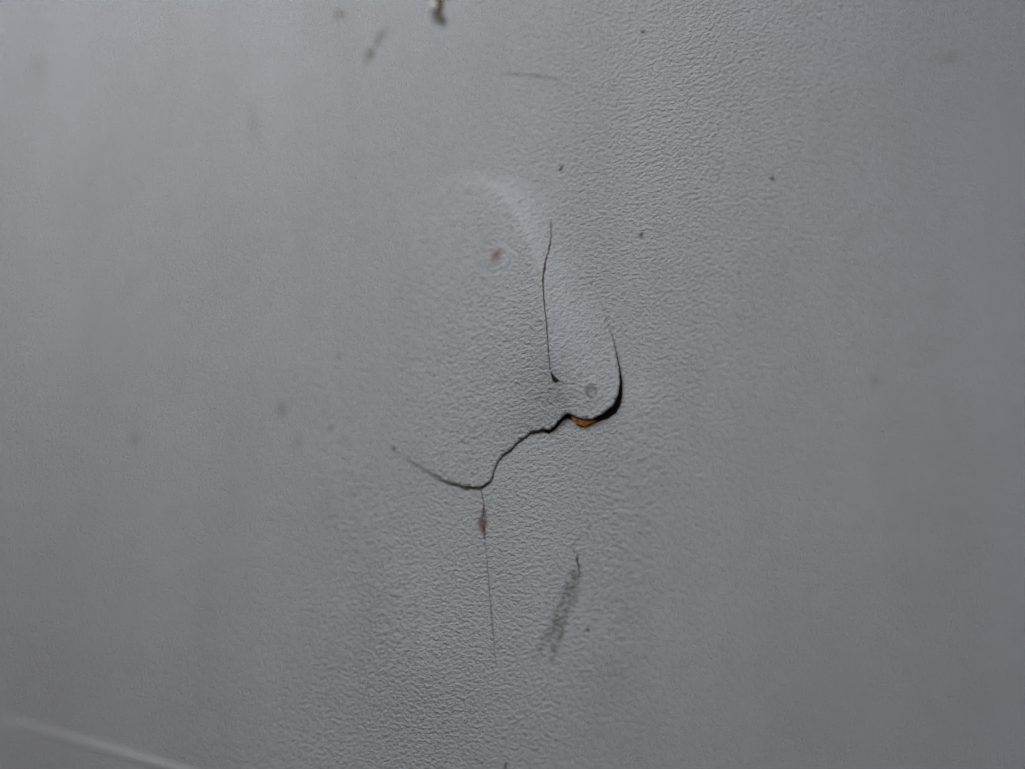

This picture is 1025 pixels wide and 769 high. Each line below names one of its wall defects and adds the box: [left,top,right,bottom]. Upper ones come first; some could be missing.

crack [542,232,559,381]
crack [441,418,567,498]